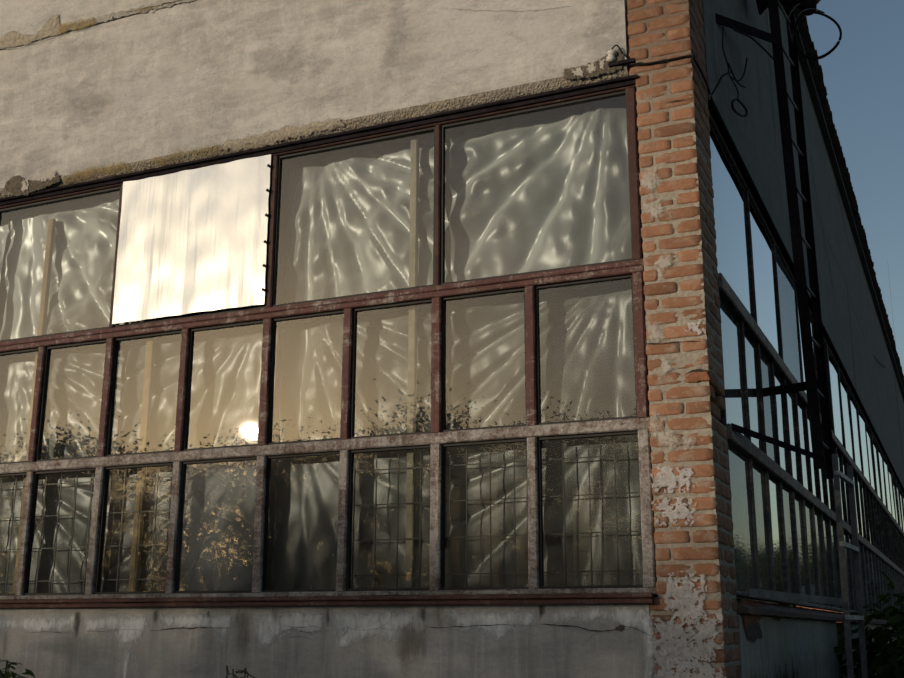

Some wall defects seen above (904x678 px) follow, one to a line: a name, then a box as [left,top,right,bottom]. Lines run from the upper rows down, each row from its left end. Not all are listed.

crack [445,5,571,13]
spalling [0,14,61,49]
spalling [563,49,623,80]
spalling [218,118,345,152]
spalling [4,170,60,196]
peeling [650,465,697,528]
leakage [0,613,231,678]
leakage [257,608,425,647]
crack [432,622,514,630]
leakage [447,606,654,675]
crack [543,624,651,642]
peeling [649,571,726,678]